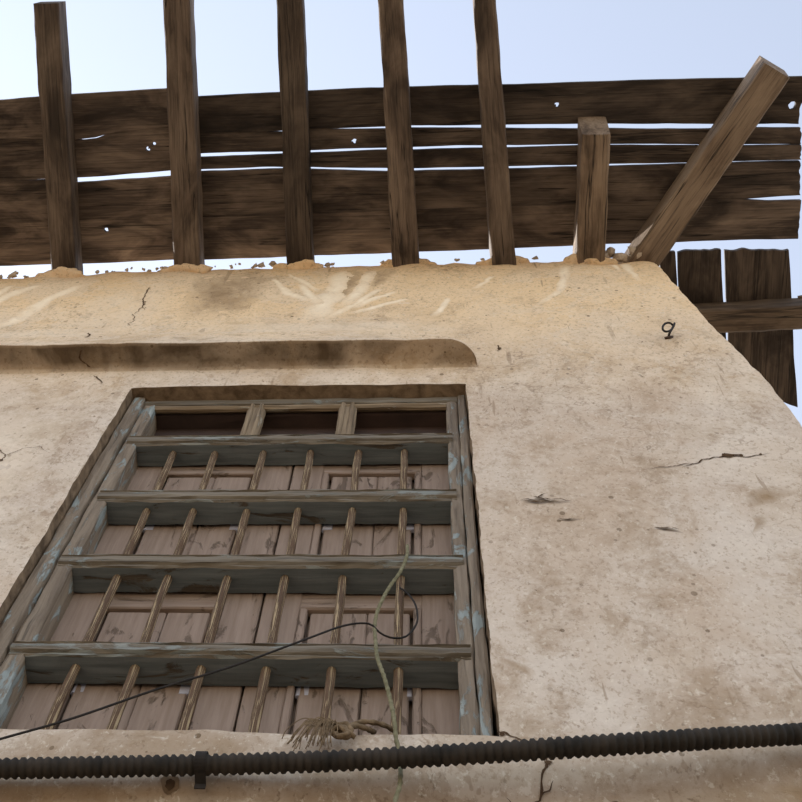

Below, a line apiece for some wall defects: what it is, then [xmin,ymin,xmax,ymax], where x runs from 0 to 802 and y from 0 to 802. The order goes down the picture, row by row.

crack [655,453,767,468]
crack [535,758,553,802]